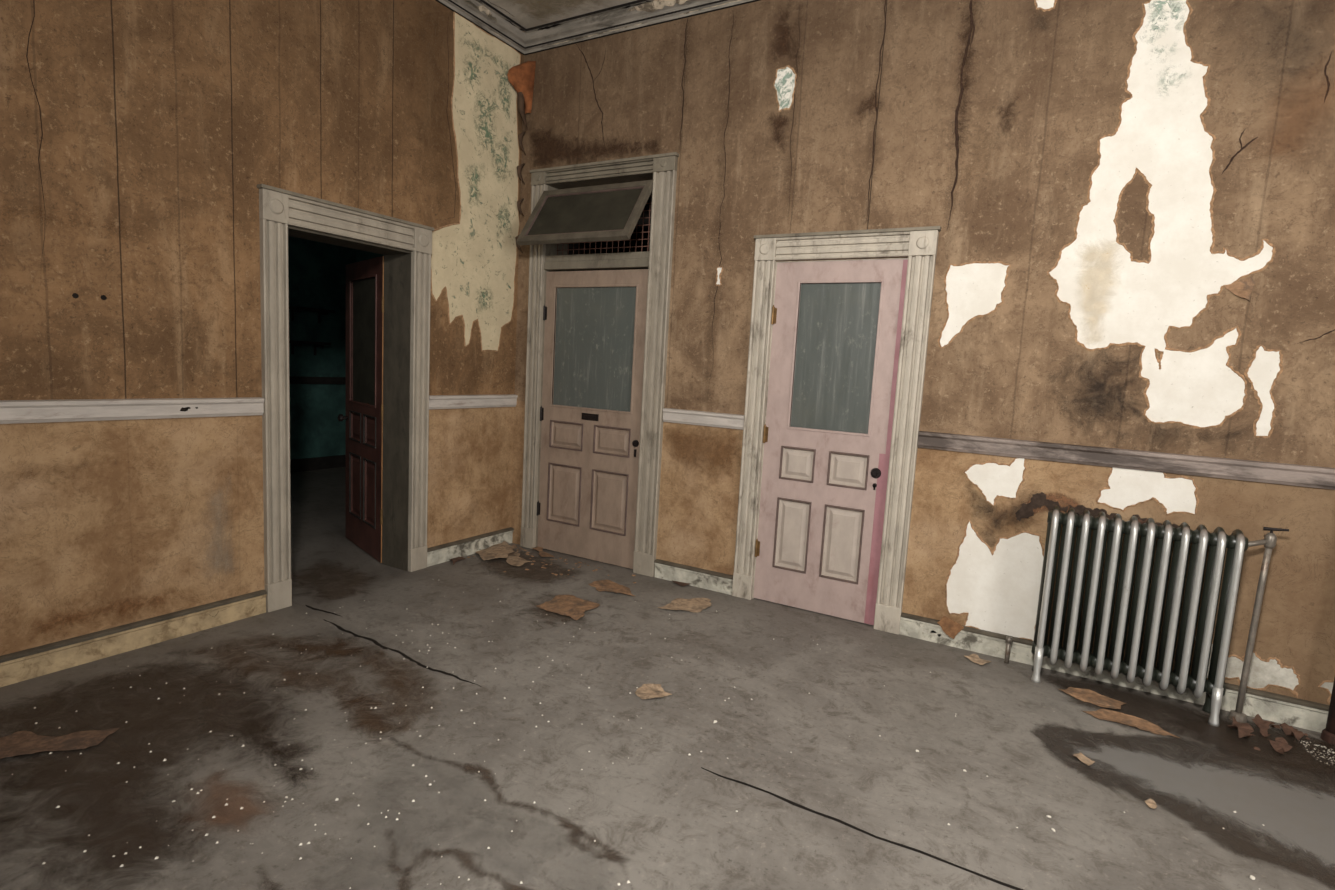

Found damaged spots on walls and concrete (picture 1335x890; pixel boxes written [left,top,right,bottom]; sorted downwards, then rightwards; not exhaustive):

peeling [464,0,741,45]
spalling [1015,492,1117,521]
leakage [0,637,425,878]
leakage [424,849,528,890]
leakage [447,762,622,861]
crack [701,767,1024,890]
leakage [1034,676,1335,888]